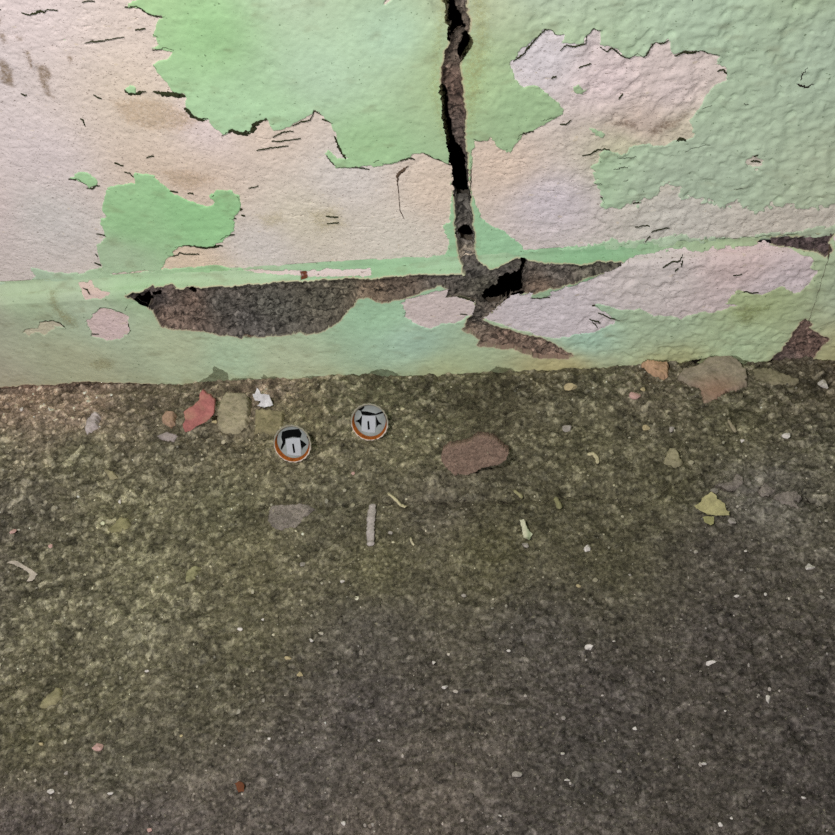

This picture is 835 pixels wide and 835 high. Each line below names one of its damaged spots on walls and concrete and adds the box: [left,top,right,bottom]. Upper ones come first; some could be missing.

peeling [0,0,835,341]
crack [442,0,571,355]